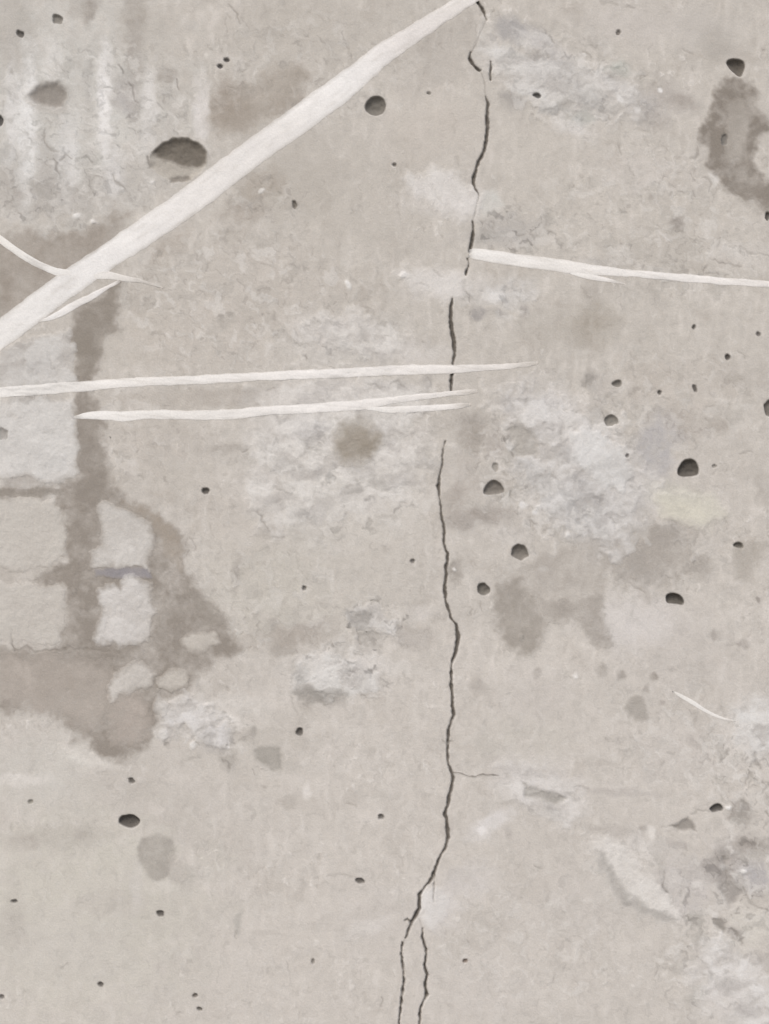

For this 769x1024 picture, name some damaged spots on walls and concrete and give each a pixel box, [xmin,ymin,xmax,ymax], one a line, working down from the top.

crack [464,0,493,277]
water stain [693,72,769,215]
crack [448,297,458,391]
water stain [0,280,247,767]
crack [398,440,499,1024]